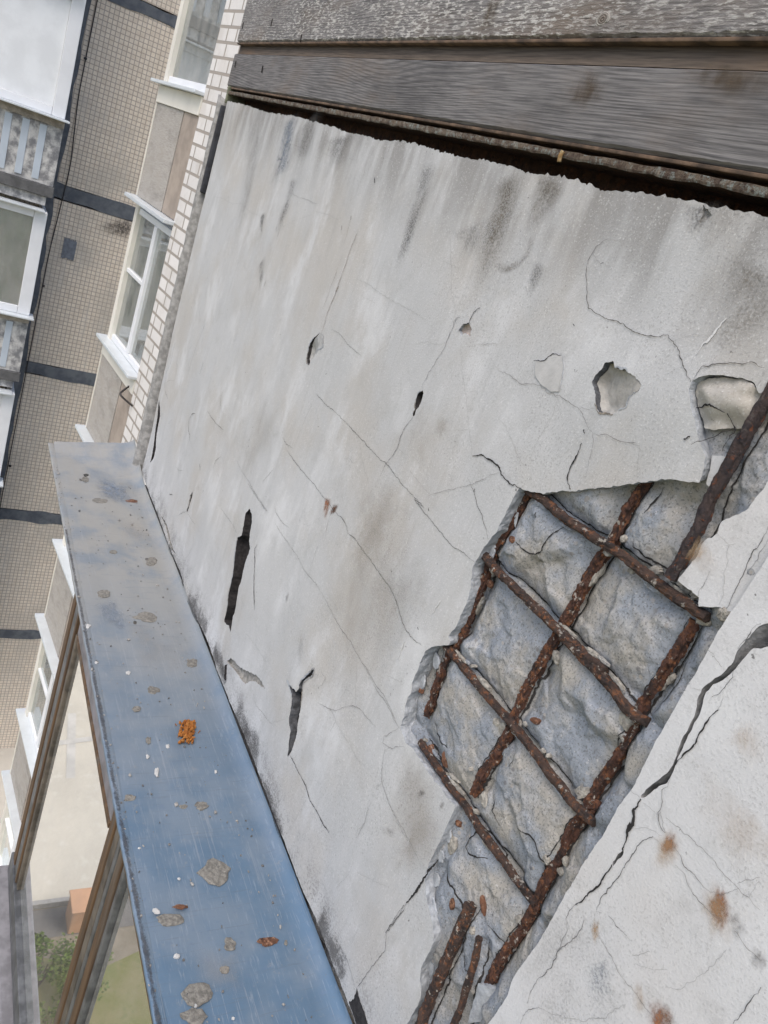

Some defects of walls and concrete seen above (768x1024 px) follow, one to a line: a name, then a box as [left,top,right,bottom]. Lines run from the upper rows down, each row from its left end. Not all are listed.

spalling [306,333,324,365]
spalling [592,361,641,416]
spalling [224,509,250,632]
spalling [286,667,315,756]
spalling [401,375,768,1024]
crack [520,623,768,1024]
rust [711,894,727,922]
spalling [308,905,356,1024]
rust [653,1009,670,1024]